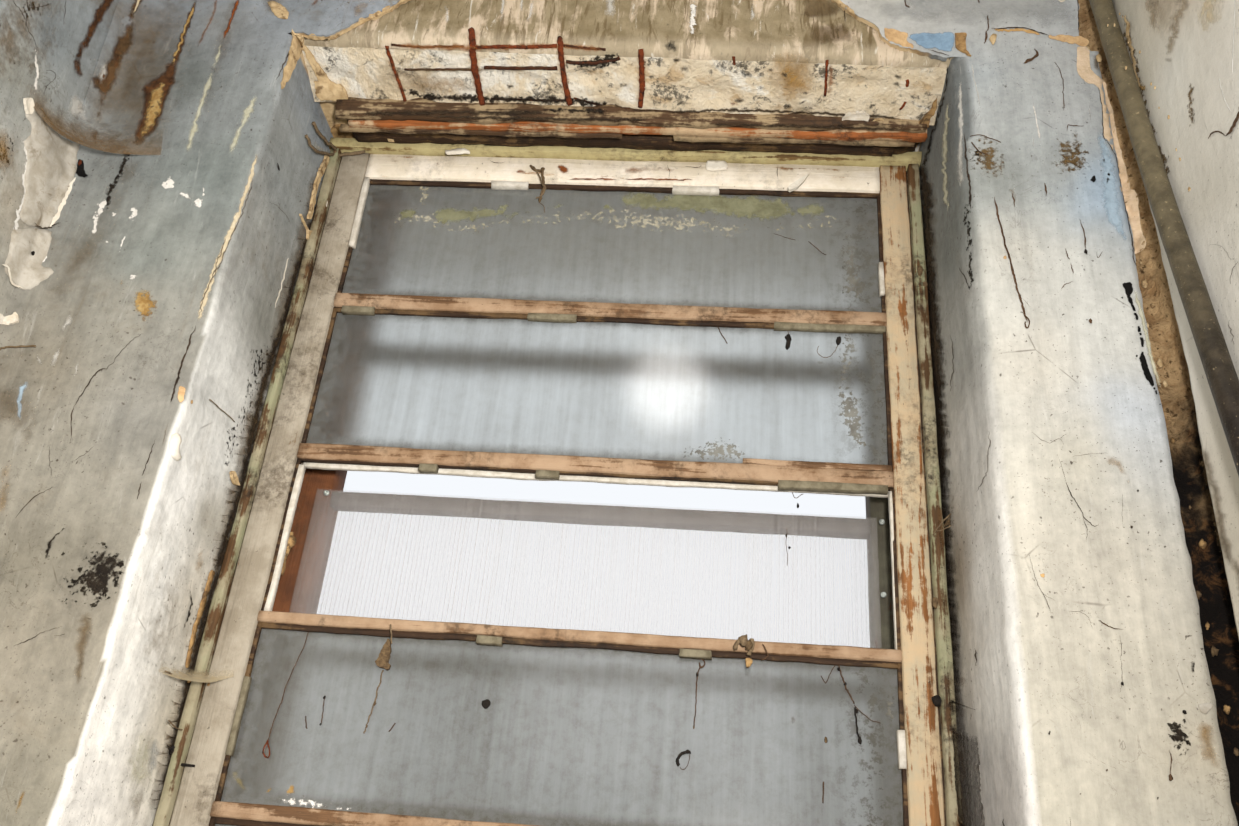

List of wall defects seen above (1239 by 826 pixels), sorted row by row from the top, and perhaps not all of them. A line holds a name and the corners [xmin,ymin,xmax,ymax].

rust [74,0,142,115]
rust [106,3,196,206]
rust [404,68,622,108]
rust [552,45,619,69]
spalling [268,0,974,289]
crack [1208,111,1239,139]
crack [994,197,1030,328]
water stain [62,542,124,607]